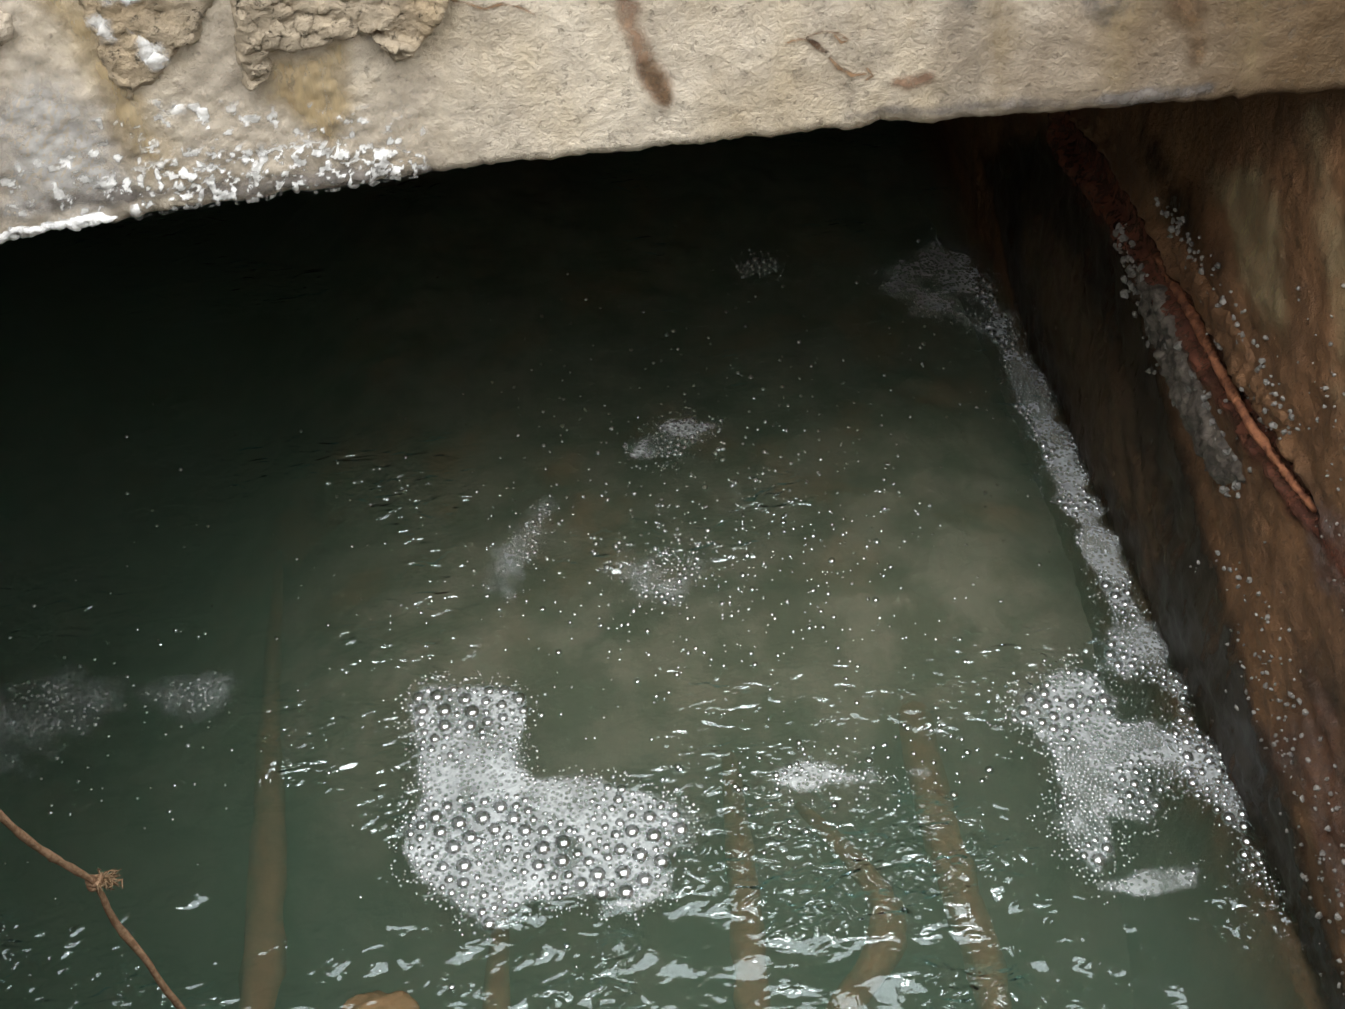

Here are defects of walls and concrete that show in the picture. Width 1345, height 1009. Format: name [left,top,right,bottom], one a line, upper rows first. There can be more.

spalling [78,0,214,100]
spalling [230,0,450,91]
crack [450,0,531,13]
corrosion [618,0,671,104]
crack [787,31,873,81]
leakage [0,0,424,244]
corrosion [1045,110,1345,585]